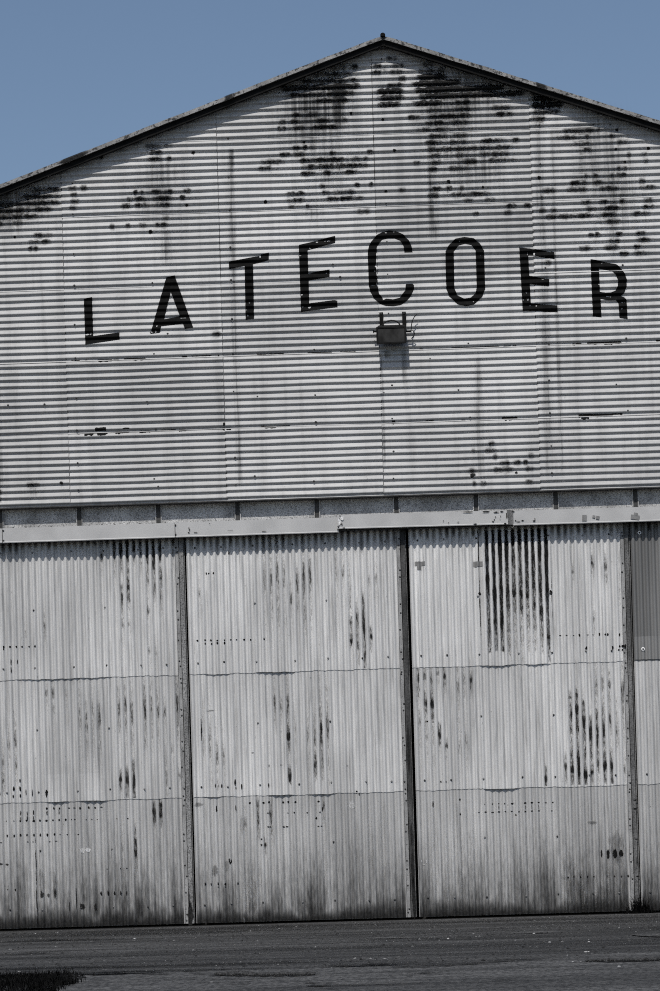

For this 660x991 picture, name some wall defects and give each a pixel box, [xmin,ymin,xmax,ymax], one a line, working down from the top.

damp [333,88,341,124]
rust [484,529,550,653]
rust [564,689,625,784]